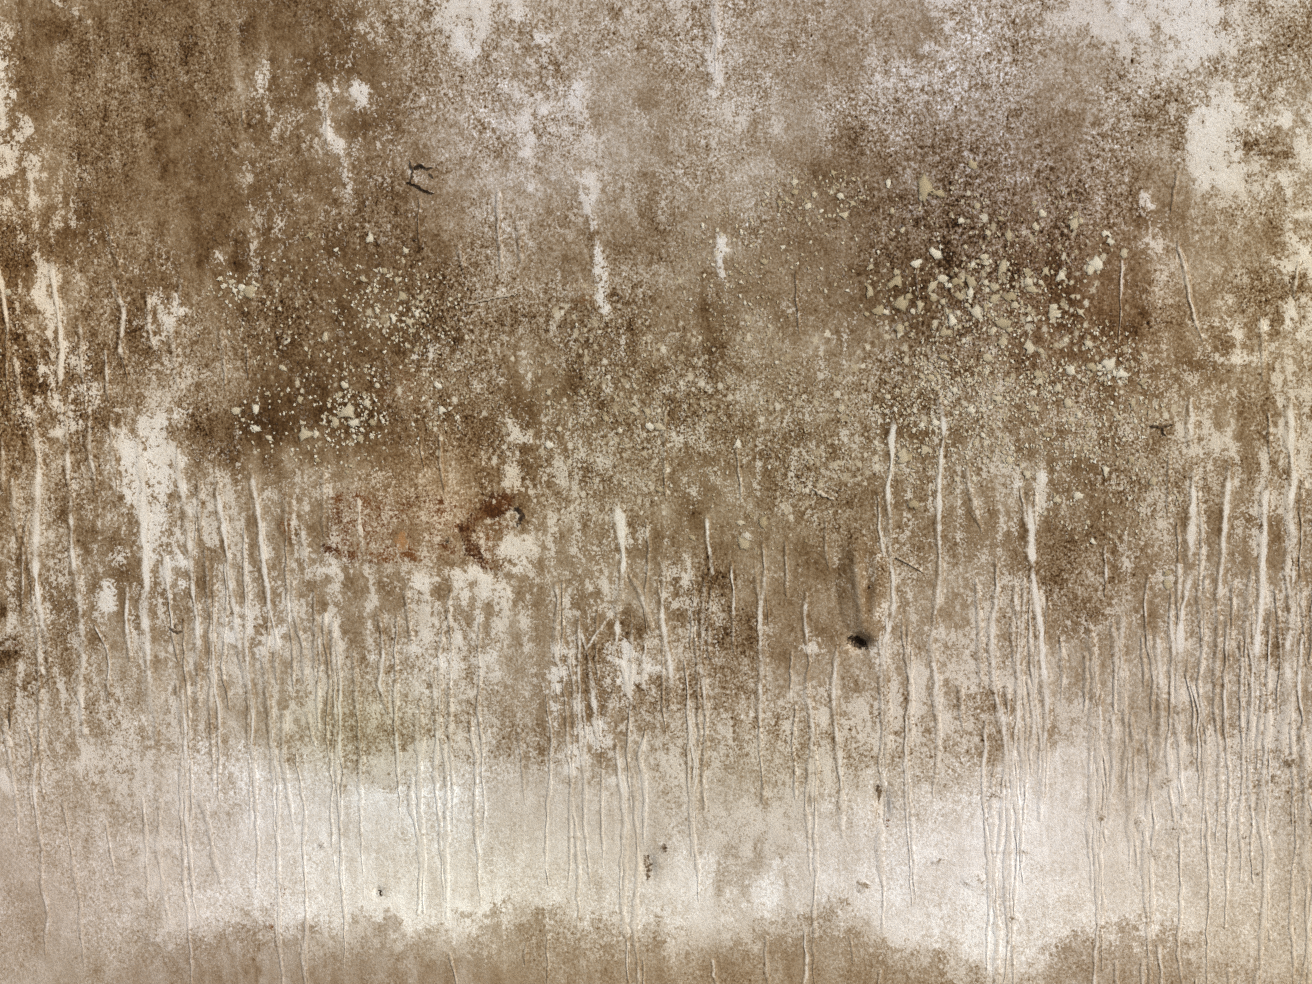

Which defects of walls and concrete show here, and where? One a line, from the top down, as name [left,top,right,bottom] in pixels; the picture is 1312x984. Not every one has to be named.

efflorescence [312,74,373,197]
crack [406,160,436,194]
water stain [406,0,613,320]
water stain [754,0,1312,387]
efflorescence [140,284,179,398]
efflorescence [0,250,116,739]
efflorescence [133,431,166,742]
water stain [175,441,207,709]
corrosion [276,483,298,547]
corrosion [314,482,525,575]
water stain [395,531,539,706]
water stain [1175,395,1312,984]